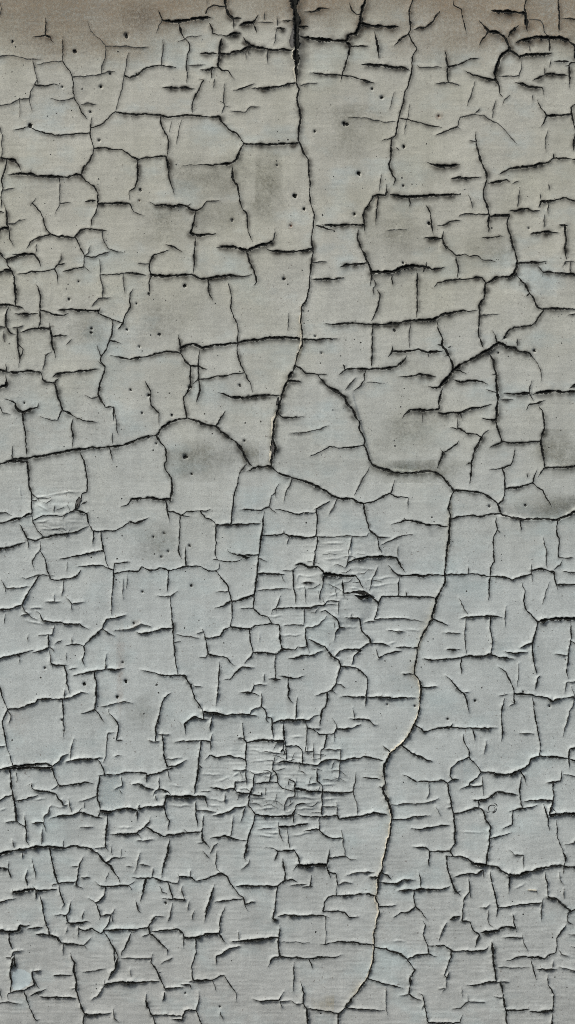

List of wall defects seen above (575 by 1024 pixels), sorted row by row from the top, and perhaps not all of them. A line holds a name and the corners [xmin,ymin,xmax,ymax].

crack [157,0,258,110]
crack [353,0,517,185]
crack [466,0,575,149]
crack [0,198,118,362]
crack [0,285,133,433]
crack [139,201,275,298]
crack [325,134,575,484]
crack [0,612,88,747]
crack [424,585,575,690]
crack [0,693,313,1024]
crack [393,667,575,921]
crack [461,874,575,1024]